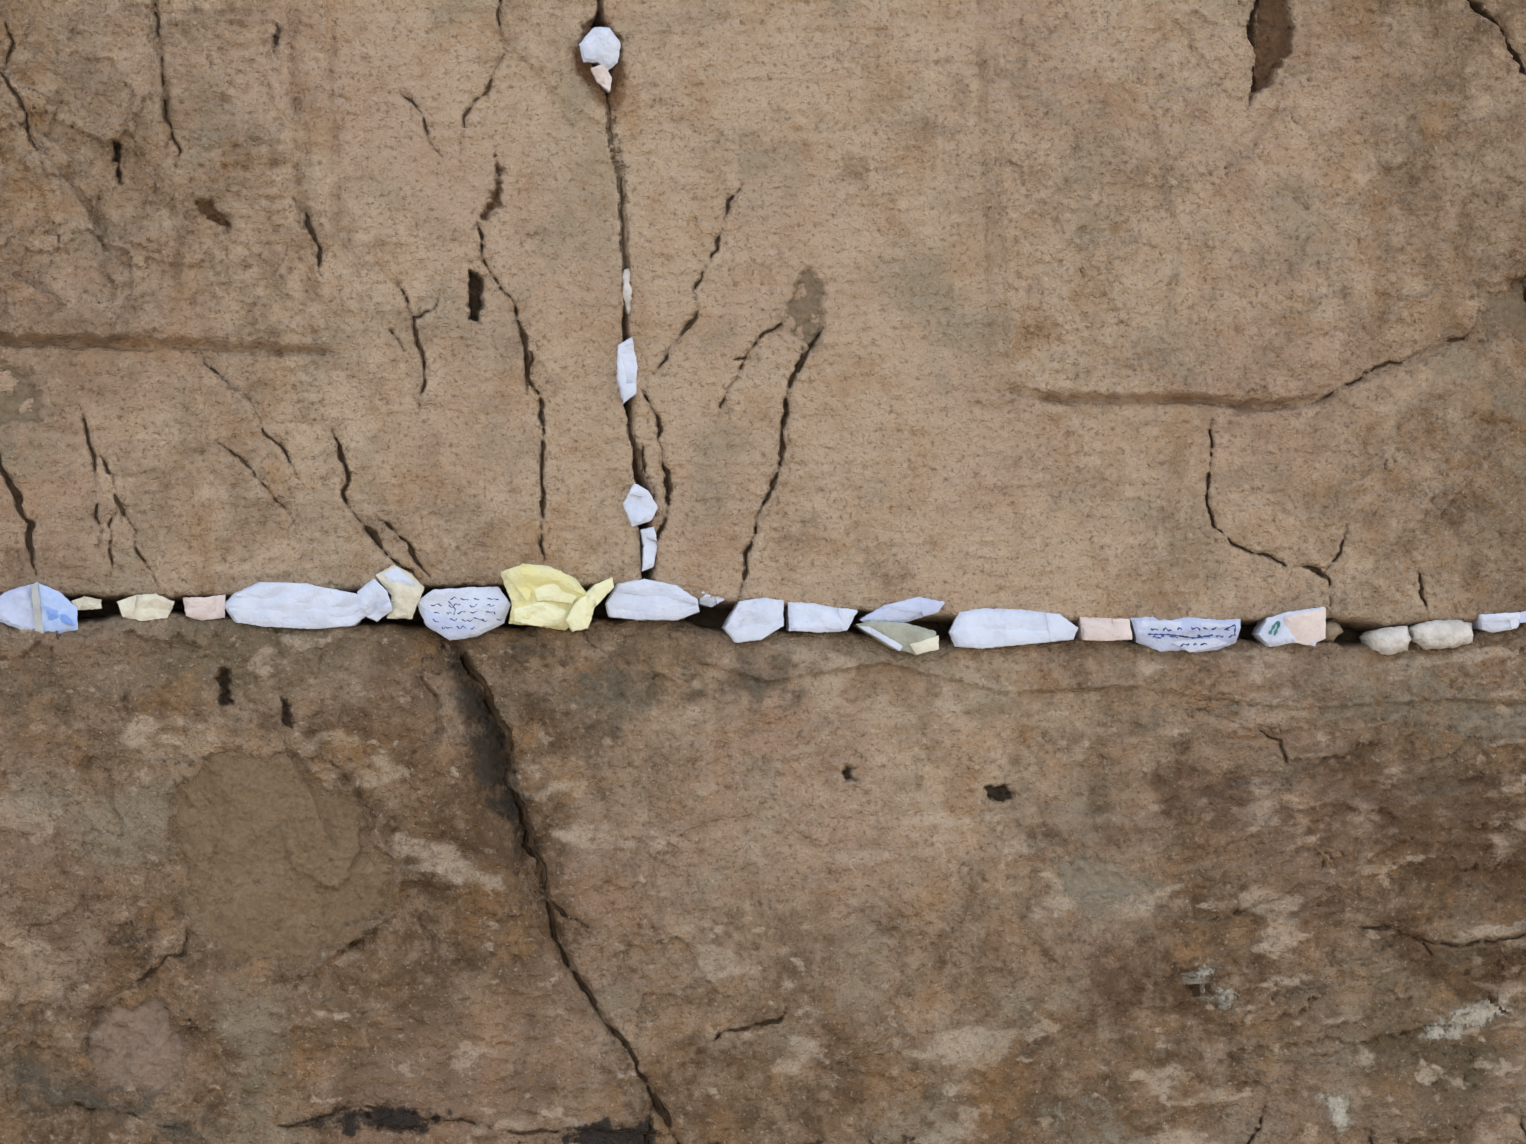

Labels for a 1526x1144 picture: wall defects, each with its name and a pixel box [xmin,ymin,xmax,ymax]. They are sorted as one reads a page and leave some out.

crack [0,23,36,147]
crack [463,79,492,127]
spalling [1239,0,1293,93]
crack [1467,0,1526,74]
crack [0,465,34,567]
crack [83,419,146,564]
crack [335,437,422,573]
crack [479,227,545,555]
crack [719,323,820,580]
crack [1205,429,1345,586]
crack [277,651,680,1144]